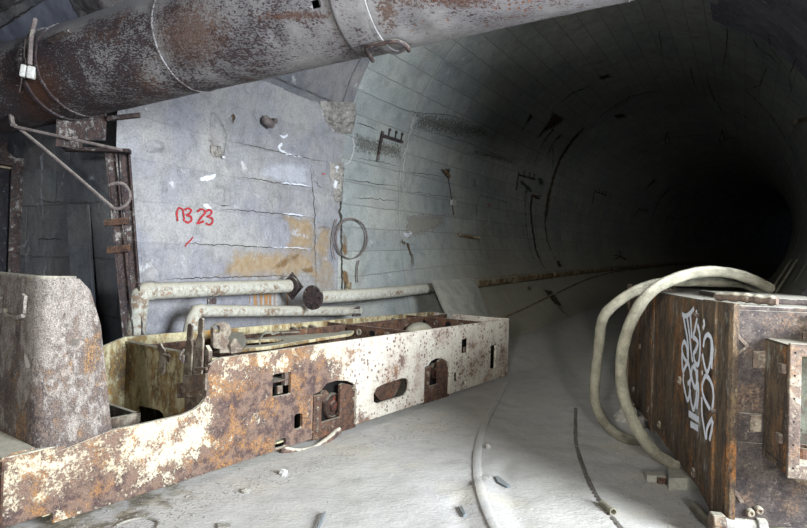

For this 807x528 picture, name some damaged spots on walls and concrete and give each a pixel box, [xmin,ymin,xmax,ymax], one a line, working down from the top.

corrosion [229,218,329,275]